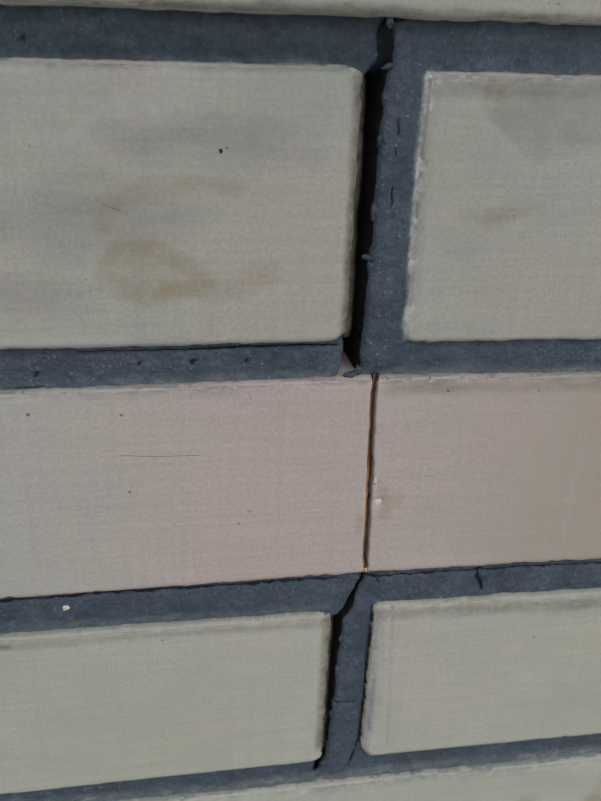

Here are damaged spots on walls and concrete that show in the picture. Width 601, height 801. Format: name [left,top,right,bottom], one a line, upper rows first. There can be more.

crack [77,17,410,378]
crack [313,372,601,777]